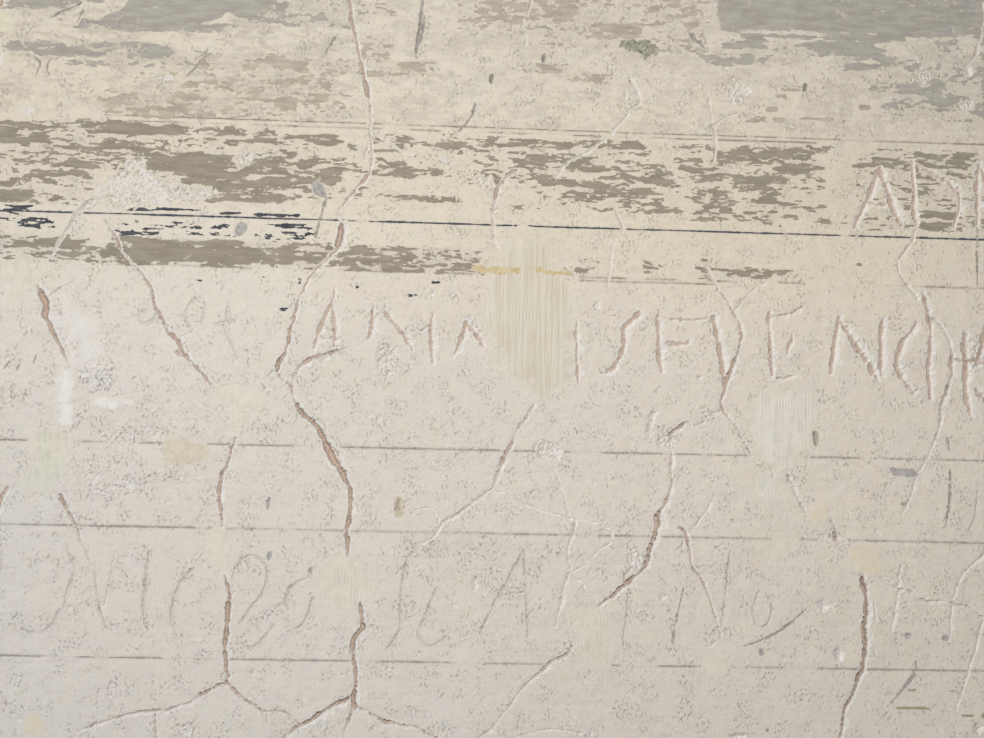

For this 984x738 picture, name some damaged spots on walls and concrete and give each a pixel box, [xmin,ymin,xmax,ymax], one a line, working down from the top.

peeling [0,0,984,284]
crack [556,76,643,178]
crack [964,1,984,68]
crack [34,274,84,370]
crack [51,197,215,388]
crack [273,0,416,560]
crack [896,227,960,518]
crack [56,491,117,631]
crack [214,435,240,528]
crack [75,572,441,738]
crack [413,262,807,738]
crack [837,550,984,738]